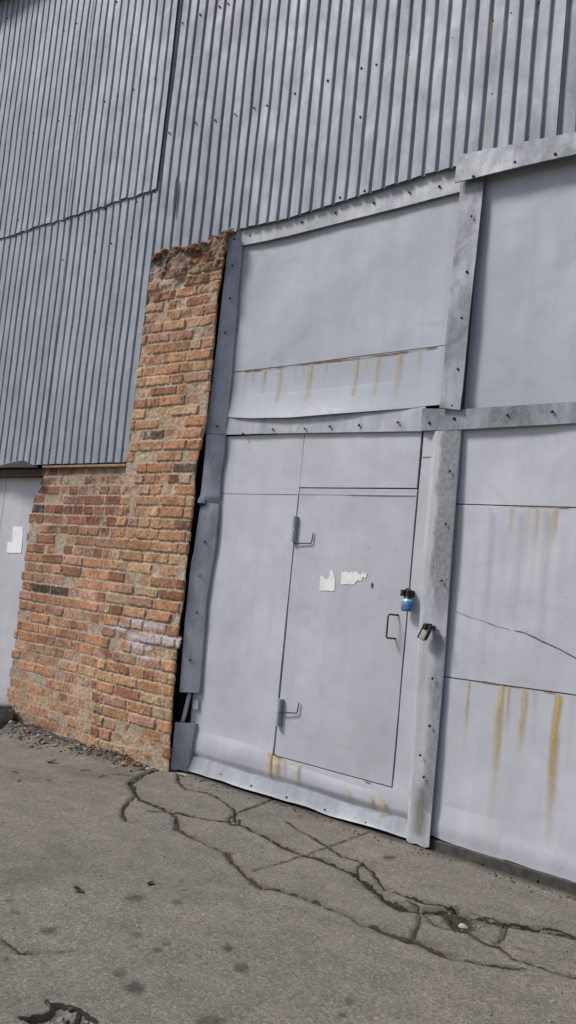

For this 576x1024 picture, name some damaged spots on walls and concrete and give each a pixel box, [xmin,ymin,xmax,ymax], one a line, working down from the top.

rust [244,347,437,380]
crack [463,614,576,659]
rust [482,681,561,748]